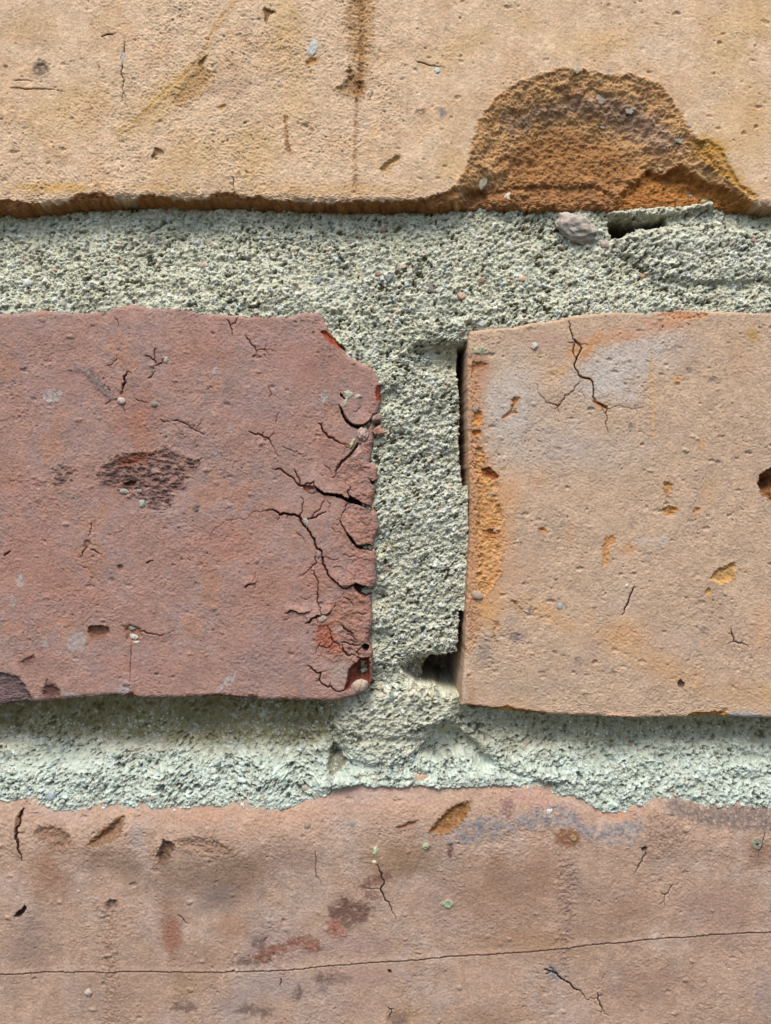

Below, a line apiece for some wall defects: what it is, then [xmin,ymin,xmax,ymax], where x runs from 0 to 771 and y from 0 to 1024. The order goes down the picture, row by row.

spalling [0,64,759,219]
crack [537,322,644,431]
spalling [93,445,202,510]
crack [210,387,368,692]
crack [544,967,609,1016]